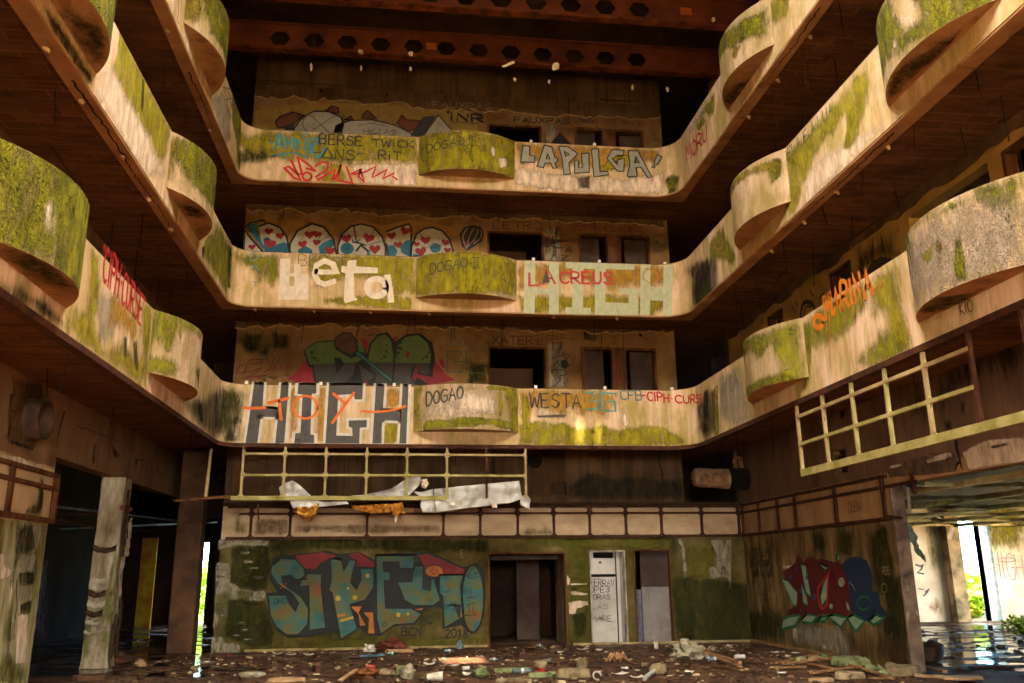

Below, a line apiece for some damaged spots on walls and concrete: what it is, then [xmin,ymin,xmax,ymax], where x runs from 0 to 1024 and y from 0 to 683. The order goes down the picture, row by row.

crack [763,7,821,85]
crack [71,80,179,239]
damp [187,389,243,441]
damp [697,369,749,440]
flaking render [93,545,117,553]
flaking render [83,576,108,636]